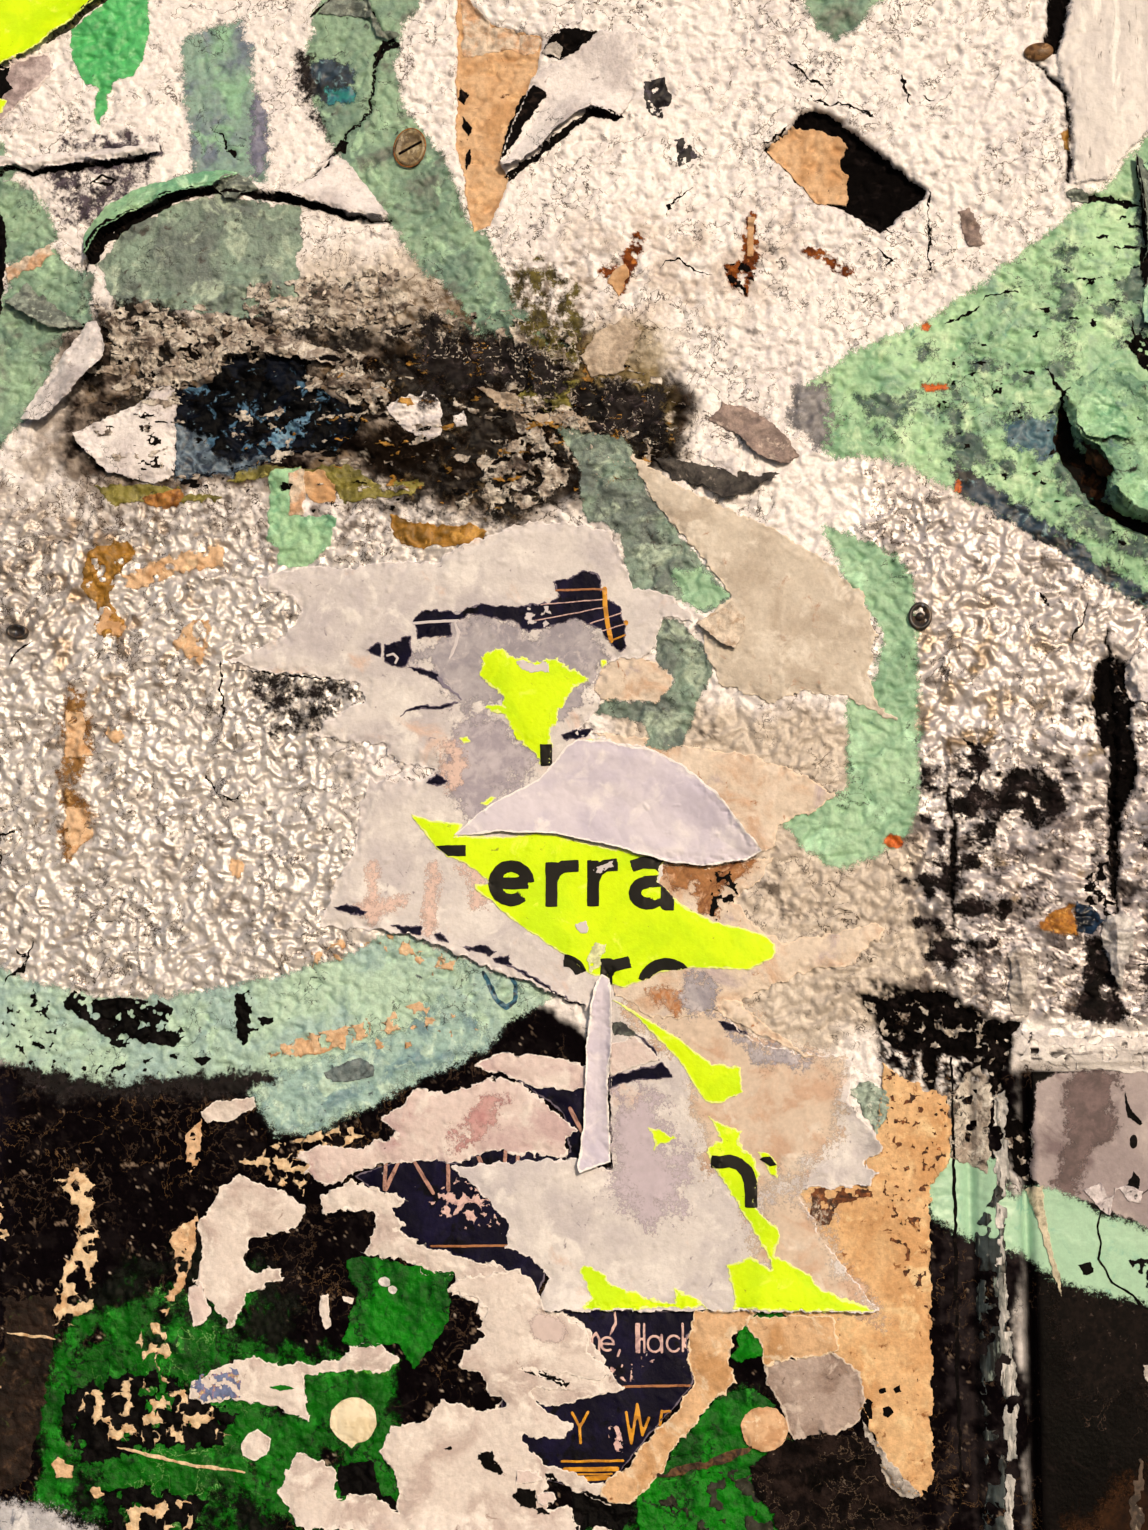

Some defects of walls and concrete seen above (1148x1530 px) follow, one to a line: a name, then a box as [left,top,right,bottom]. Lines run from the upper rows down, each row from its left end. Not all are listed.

crack [1036,0,1139,209]
spalling [764,111,926,233]
corrosion [598,231,645,297]
corrosion [724,211,761,297]
peeling [304,934,458,975]
peeling [234,990,274,1045]
peeling [268,1001,456,1058]
peeling [850,1081,890,1134]
spalling [861,989,1034,1181]
peeling [184,1119,202,1175]
peeling [239,1127,365,1196]
peeling [378,1277,397,1294]